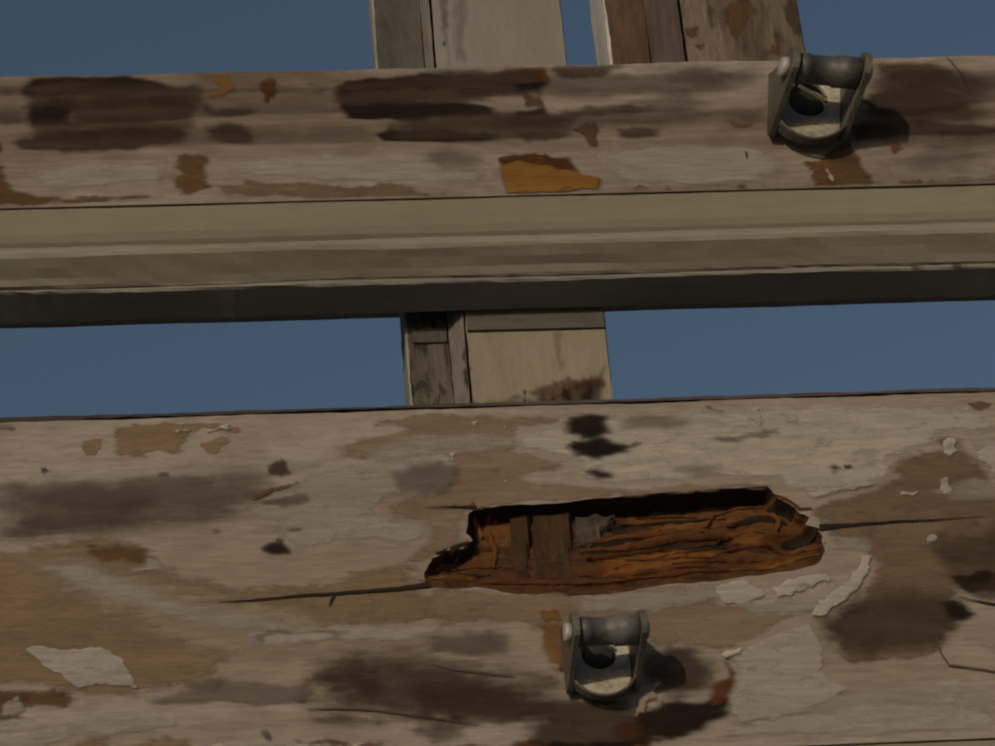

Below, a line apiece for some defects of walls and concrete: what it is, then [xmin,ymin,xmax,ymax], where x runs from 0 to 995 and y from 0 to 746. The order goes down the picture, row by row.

leakage [15,76,252,150]
leakage [336,70,568,141]
leakage [852,63,995,153]
peeling [0,166,149,205]
peeling [175,154,428,198]
peeling [805,140,872,185]
peeling [969,401,991,410]
leakage [567,414,635,458]
leakage [0,476,252,534]
crack [222,581,429,606]
peeling [0,413,995,720]
leakage [155,633,742,745]